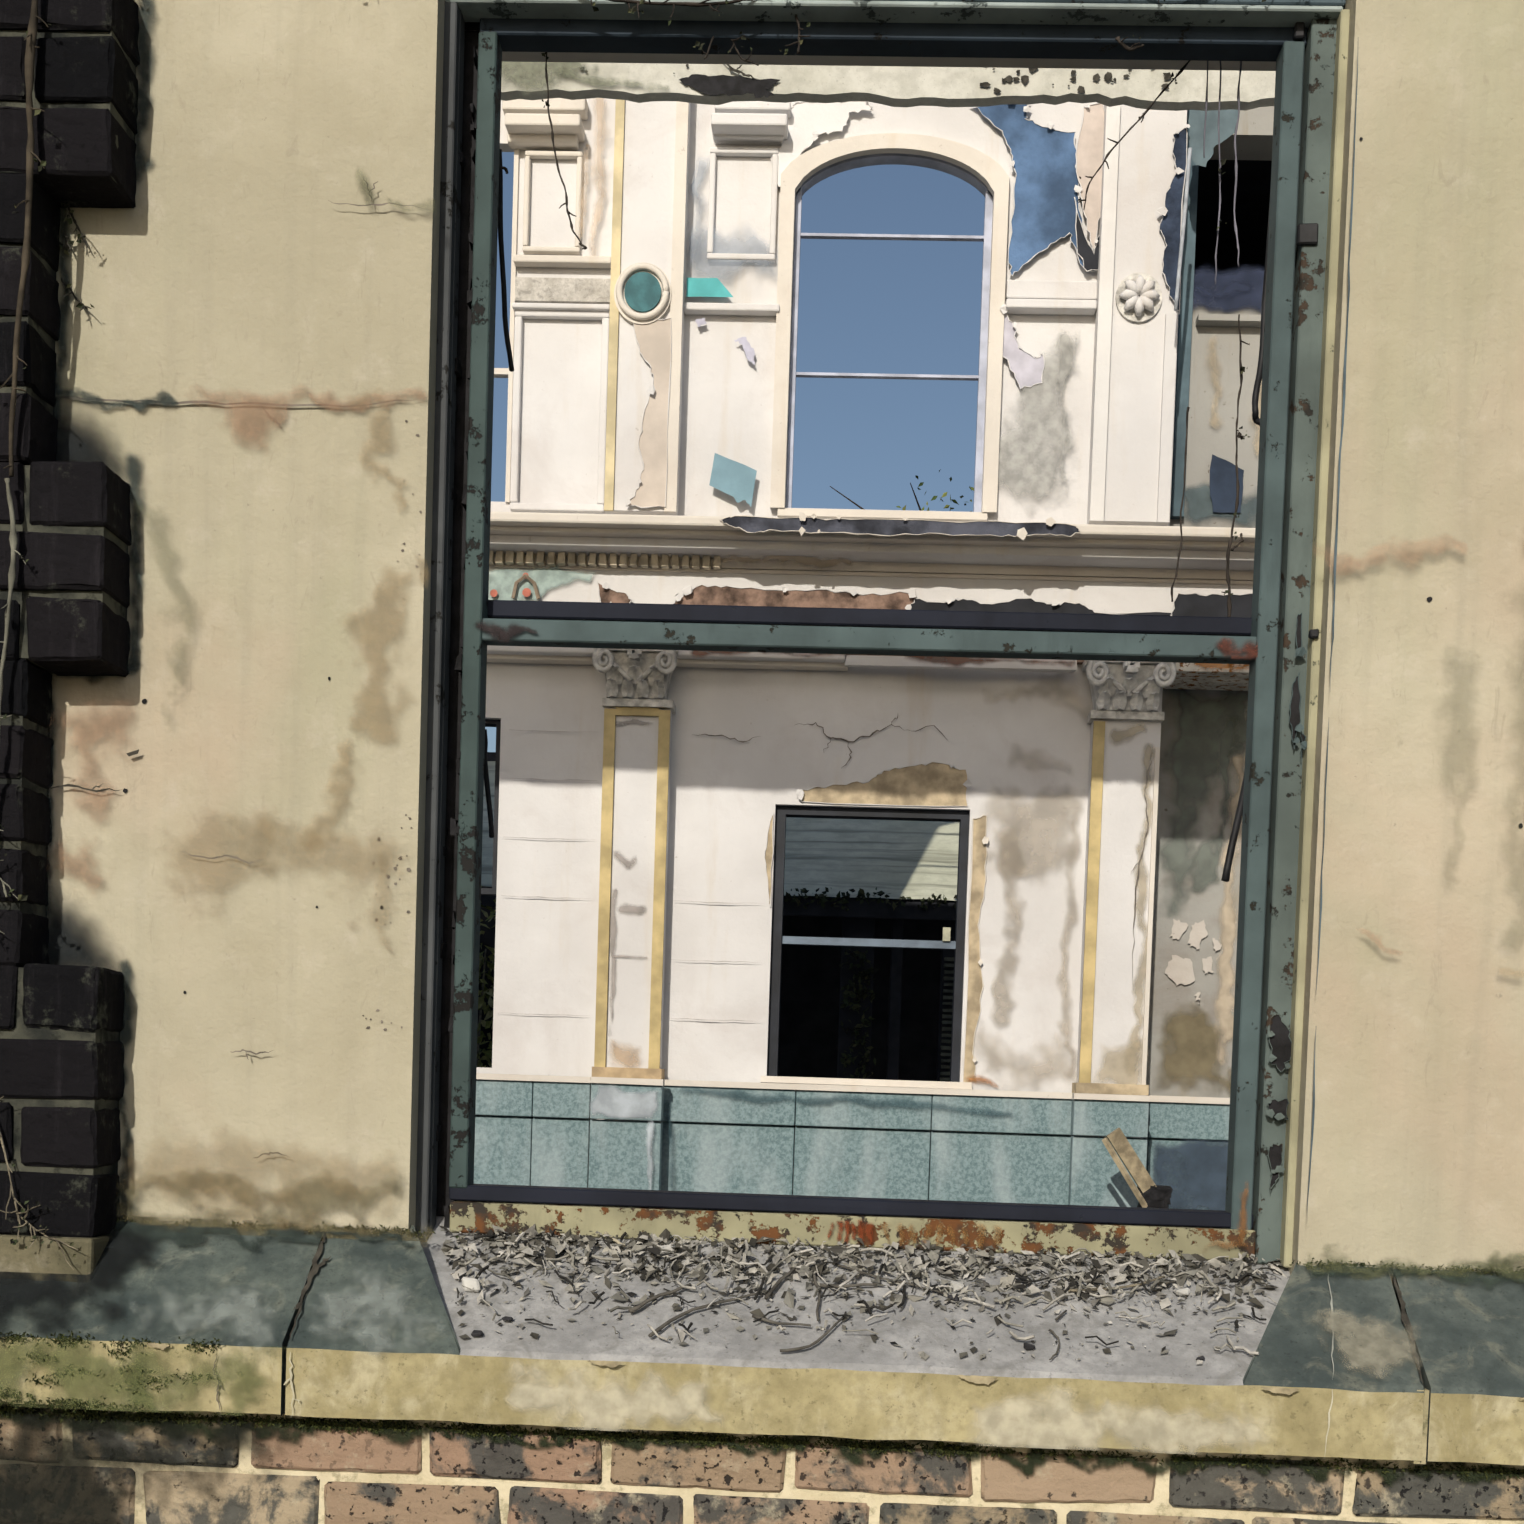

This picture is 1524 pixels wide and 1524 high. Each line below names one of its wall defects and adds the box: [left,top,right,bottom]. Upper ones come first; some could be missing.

spalling [977,68,1131,277]
crack [59,395,427,427]
peeling [625,318,672,508]
damp [998,334,1077,498]
spalling [673,584,1253,618]
crack [796,716,945,767]
spalling [796,761,989,1082]
peeling [1165,919,1222,1004]
damp [117,961,427,1245]
corrosion [828,1220,1001,1246]
crack [284,1234,331,1418]